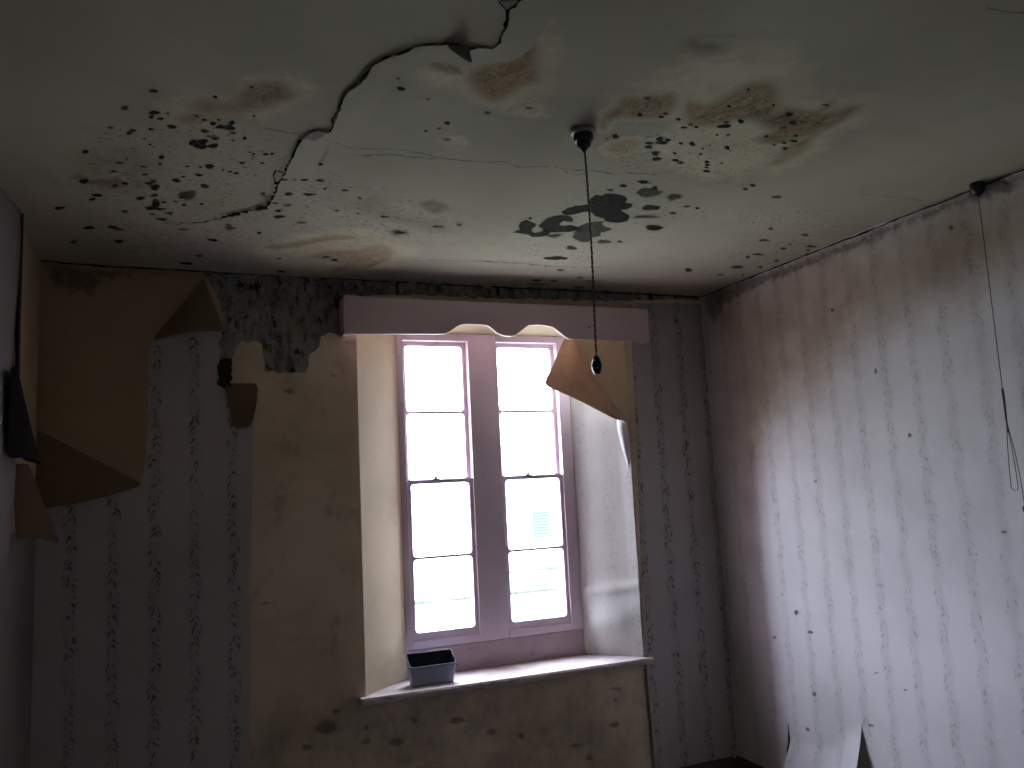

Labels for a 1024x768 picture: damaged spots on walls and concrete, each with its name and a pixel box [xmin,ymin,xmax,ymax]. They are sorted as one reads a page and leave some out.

water stain [41,111,274,265]
crack [158,0,608,226]
water stain [514,181,699,285]
water stain [606,113,744,178]
water stain [764,113,820,150]